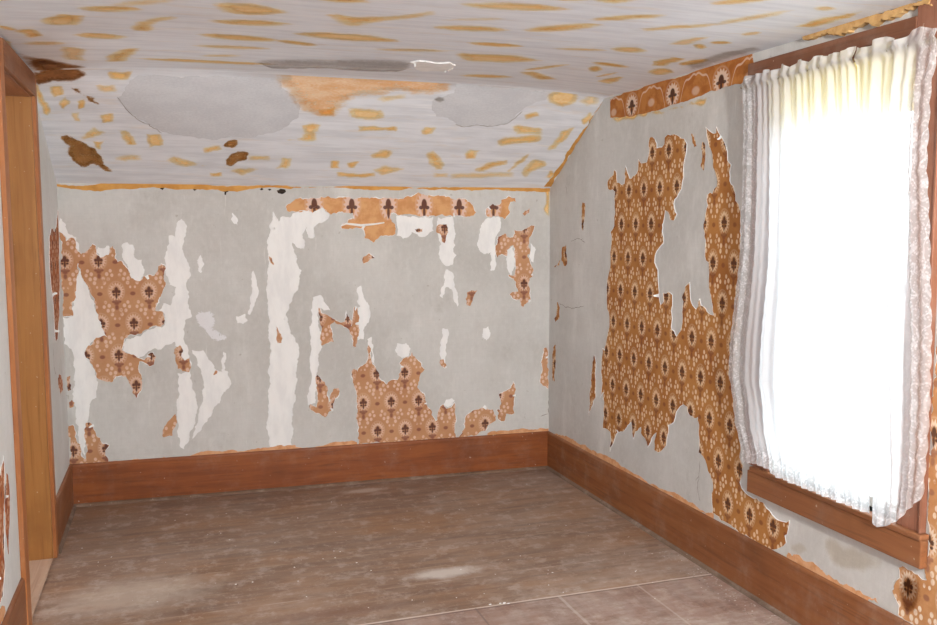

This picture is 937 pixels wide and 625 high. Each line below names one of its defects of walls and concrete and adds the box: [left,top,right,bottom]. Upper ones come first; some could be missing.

peeling [336,104,601,213]
peeling [57,183,324,192]
peeling [436,213,455,243]
peeling [58,374,74,408]
peeling [191,440,357,456]